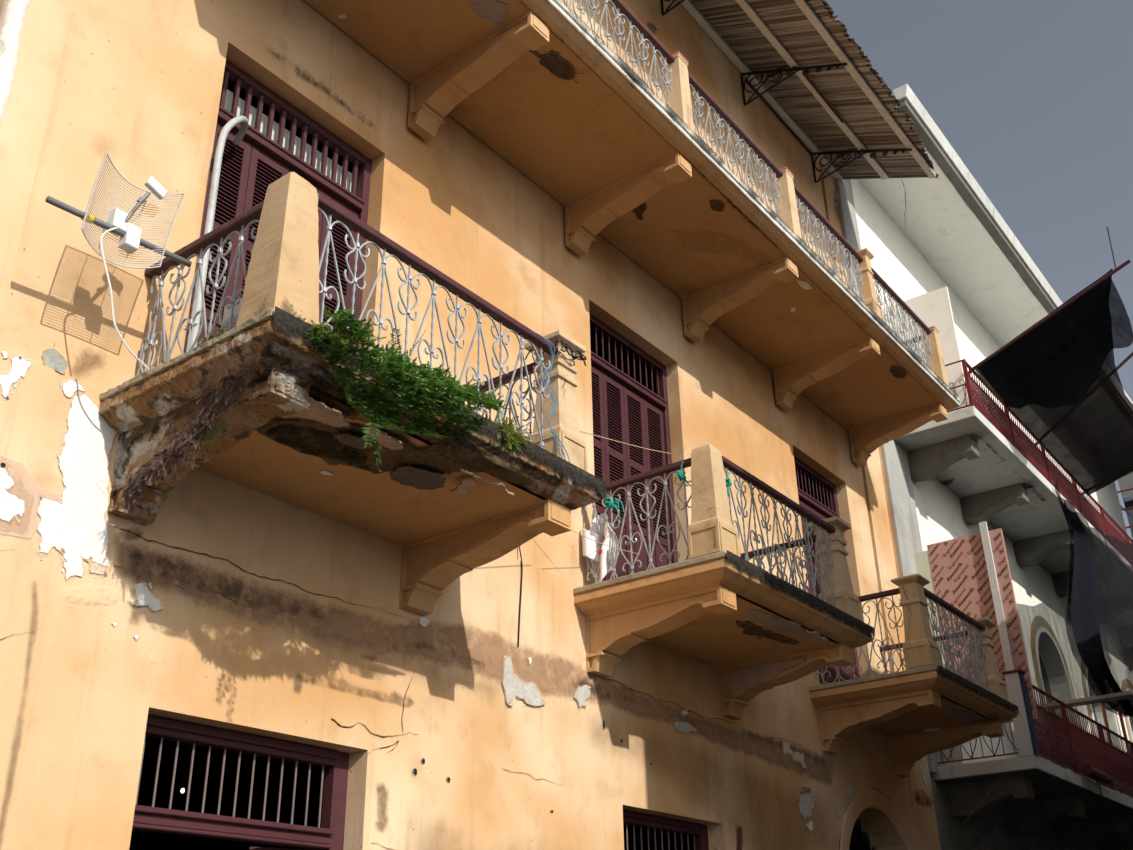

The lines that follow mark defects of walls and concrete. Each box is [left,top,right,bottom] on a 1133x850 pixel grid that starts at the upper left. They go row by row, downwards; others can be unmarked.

spalling [471,0,509,24]
flaking render [0,0,31,119]
spalling [529,50,575,80]
peeling [291,397,404,450]
peeling [0,348,117,580]
crack [113,526,404,617]
damp [727,550,875,638]
spalling [736,609,828,645]
crack [332,672,419,754]
peeling [501,655,546,706]
peeling [573,685,591,707]
peeling [798,789,817,831]